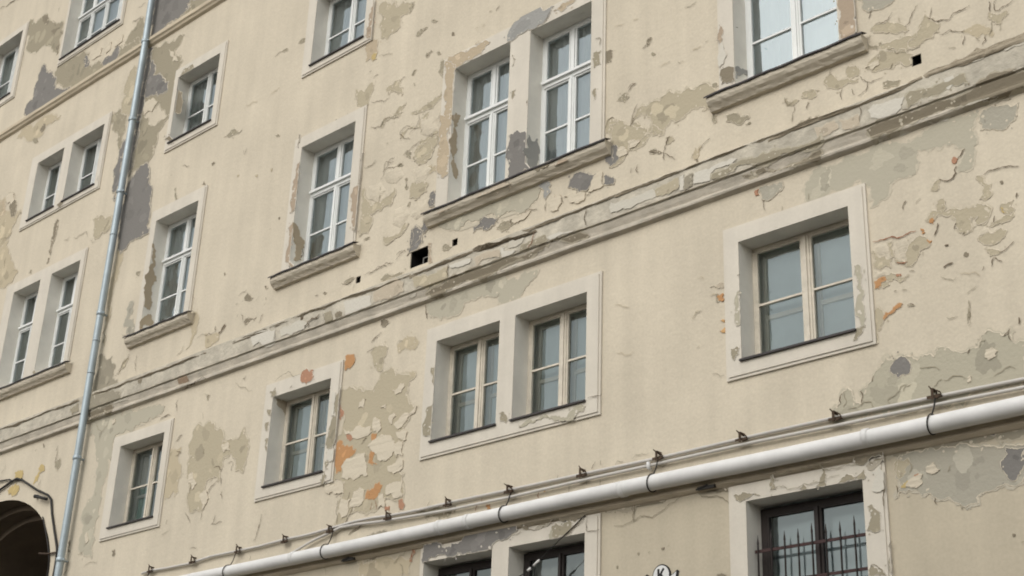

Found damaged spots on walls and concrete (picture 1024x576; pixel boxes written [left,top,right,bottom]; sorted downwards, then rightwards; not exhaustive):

peeling [0,193,32,289]
flaking render [24,0,195,330]
peeling [232,0,1024,348]
peeling [829,235,1024,431]
peeling [186,420,250,514]
peeling [320,341,433,525]
peeling [733,475,778,502]
peeling [800,434,1024,535]